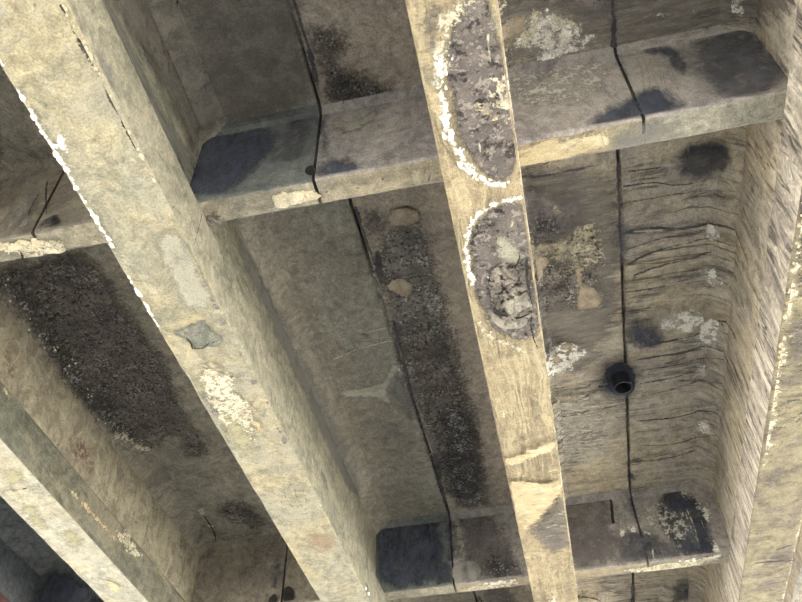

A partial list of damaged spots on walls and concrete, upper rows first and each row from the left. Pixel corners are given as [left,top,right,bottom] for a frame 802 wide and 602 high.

spalling [59,4,101,78]
damp [643,46,685,74]
damp [731,0,748,17]
damp [696,30,802,97]
spalling [105,89,144,160]
damp [594,87,685,124]
damp [420,0,608,377]
damp [617,143,748,266]
spalling [173,320,223,349]
spalling [487,254,550,349]
peeling [574,267,603,311]
spalling [115,431,151,453]